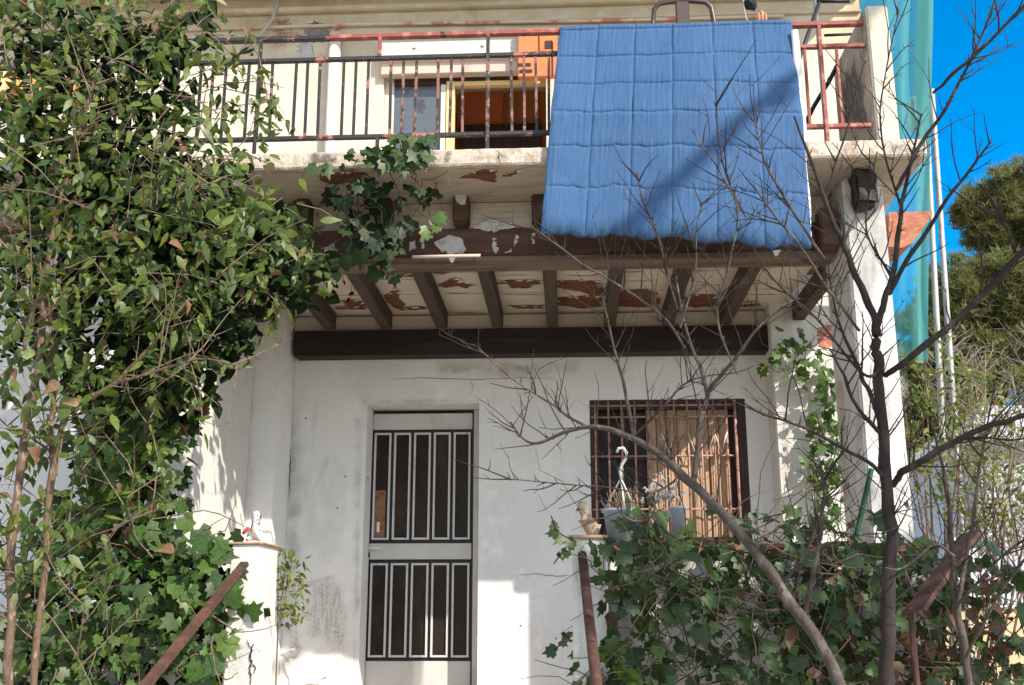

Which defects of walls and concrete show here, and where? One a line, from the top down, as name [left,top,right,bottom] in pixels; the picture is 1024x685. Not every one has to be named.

peeling [460,169,524,183]
peeling [473,219,537,254]
peeling [384,232,475,289]
peeling [334,299,367,311]
peeling [383,273,426,311]
peeling [497,279,543,289]
peeling [557,280,605,309]
peeling [618,289,662,308]
water stain [279,381,479,683]
crack [247,640,256,685]